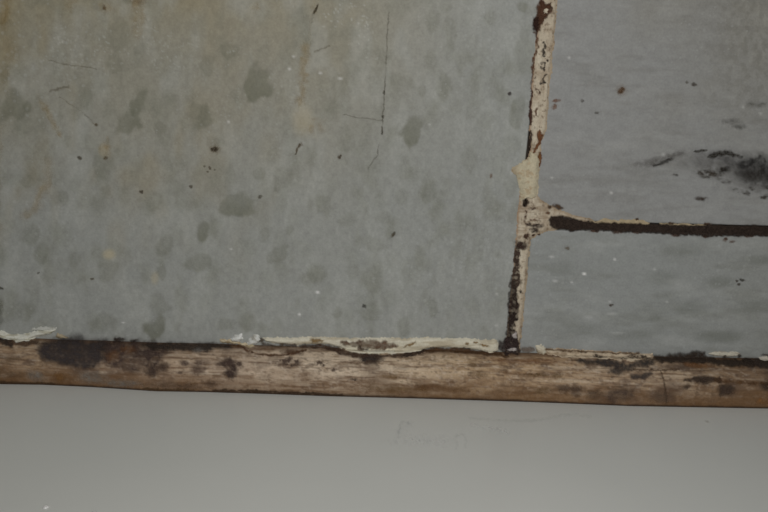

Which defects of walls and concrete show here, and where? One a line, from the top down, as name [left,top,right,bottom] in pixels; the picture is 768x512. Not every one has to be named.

damp [694,150,766,181]
peeling [0,326,69,343]
damp [0,337,230,376]
damp [221,358,242,378]
damp [262,339,426,364]
peeling [220,333,499,355]
damp [578,351,768,395]